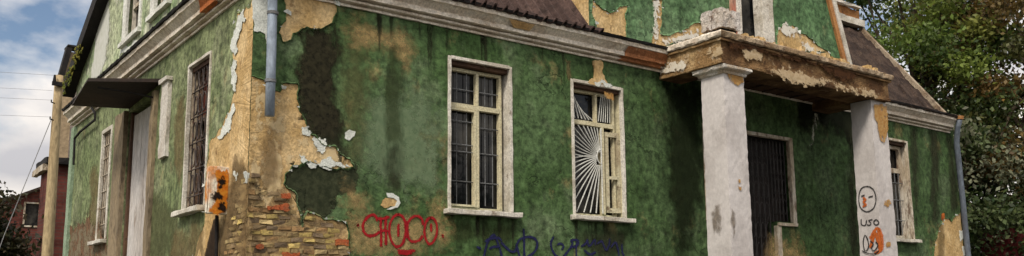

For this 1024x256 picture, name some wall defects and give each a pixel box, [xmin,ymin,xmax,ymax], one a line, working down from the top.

flaking render [588,60,612,88]
flaking render [701,22,878,98]
leakage [263,24,358,225]
flaking render [192,0,441,256]
flaking render [933,213,965,256]